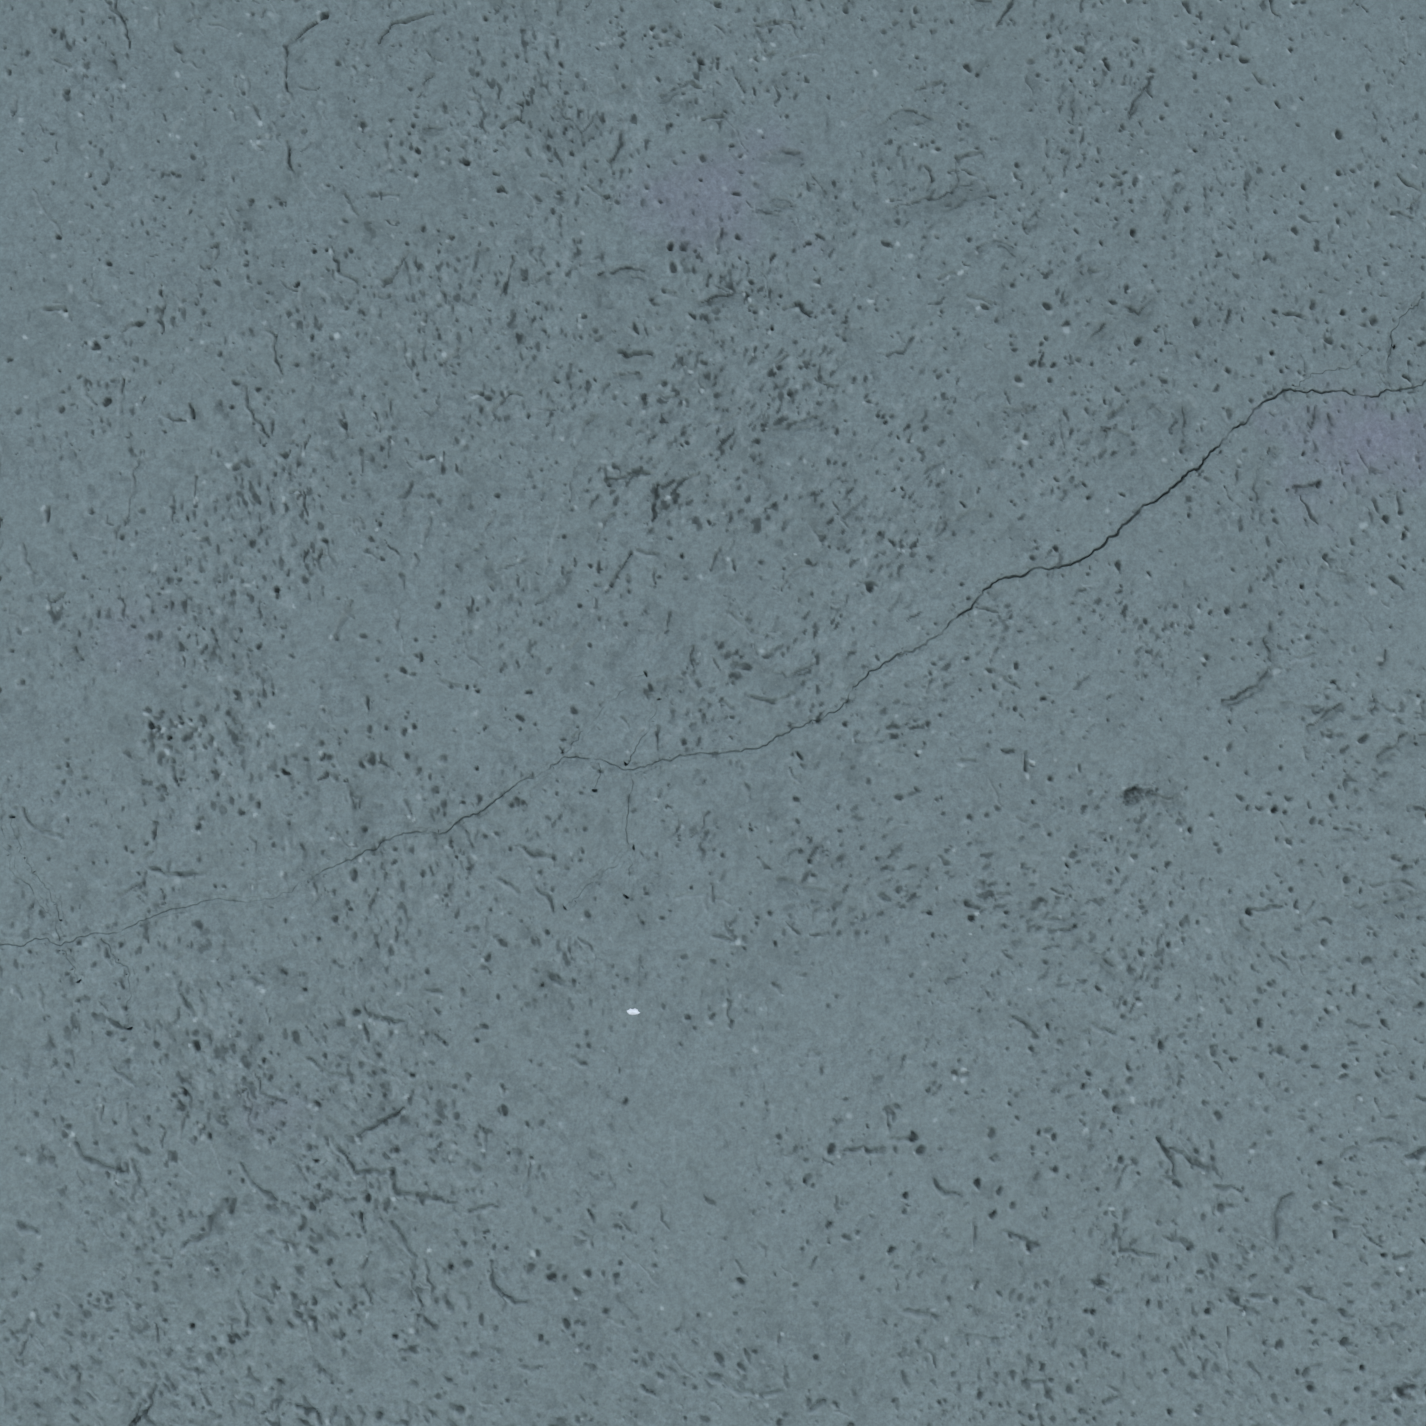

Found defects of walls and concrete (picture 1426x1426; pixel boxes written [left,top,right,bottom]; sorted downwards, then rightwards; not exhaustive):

crack [0,289,1426,1028]